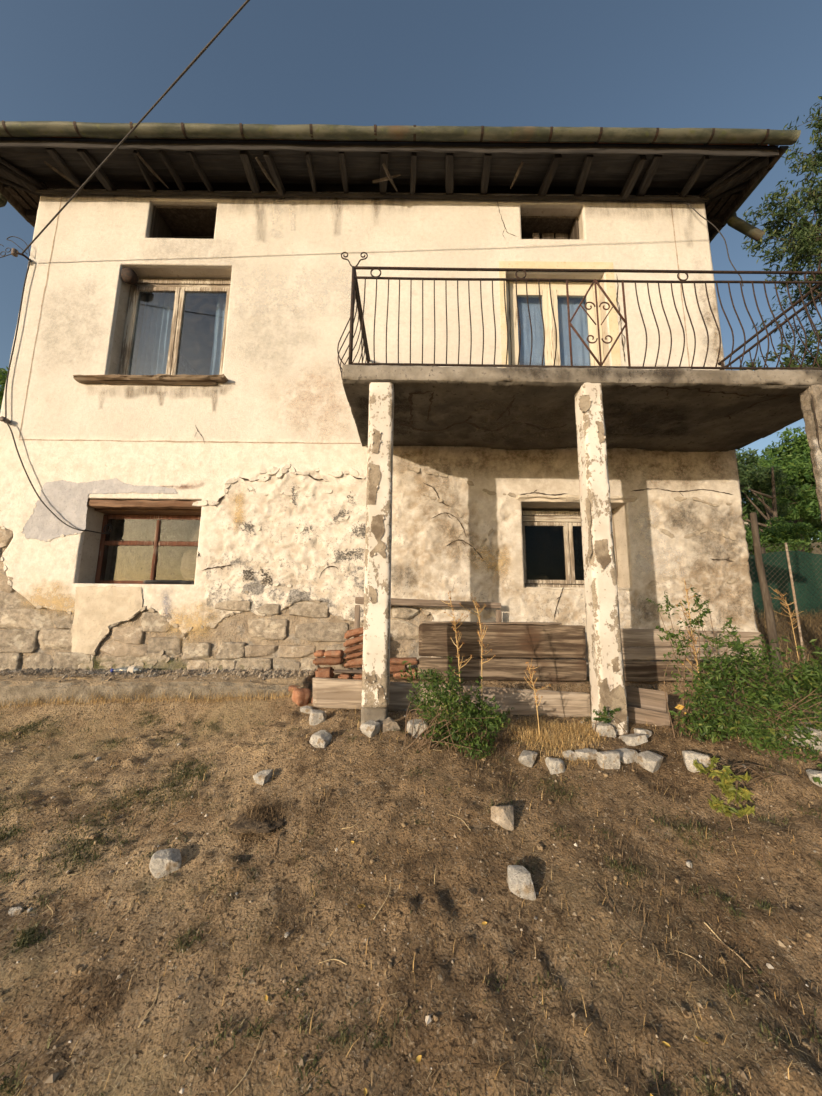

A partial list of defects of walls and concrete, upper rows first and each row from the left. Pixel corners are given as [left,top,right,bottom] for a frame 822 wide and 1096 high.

peeling [579,394,592,412]
peeling [595,421,606,443]
peeling [192,397,411,570]
crack [424,483,484,561]
peeling [585,498,611,569]
crack [633,488,733,496]
spalling [0,478,386,705]
spalling [390,605,433,670]
peeling [598,657,627,724]